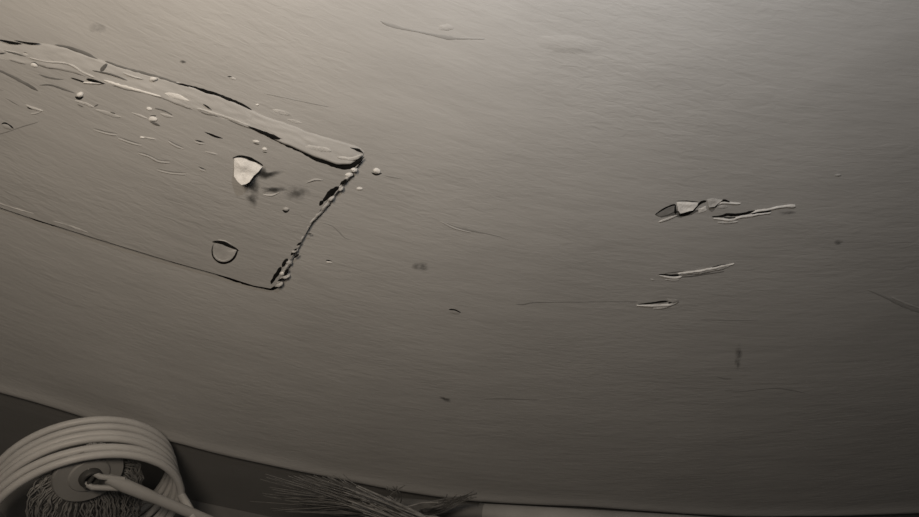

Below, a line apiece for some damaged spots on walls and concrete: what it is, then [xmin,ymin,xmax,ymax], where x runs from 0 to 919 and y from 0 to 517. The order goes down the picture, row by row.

crack [381,21,484,40]
flaking render [233,155,275,201]
spalling [270,167,358,287]
peeling [655,198,741,223]